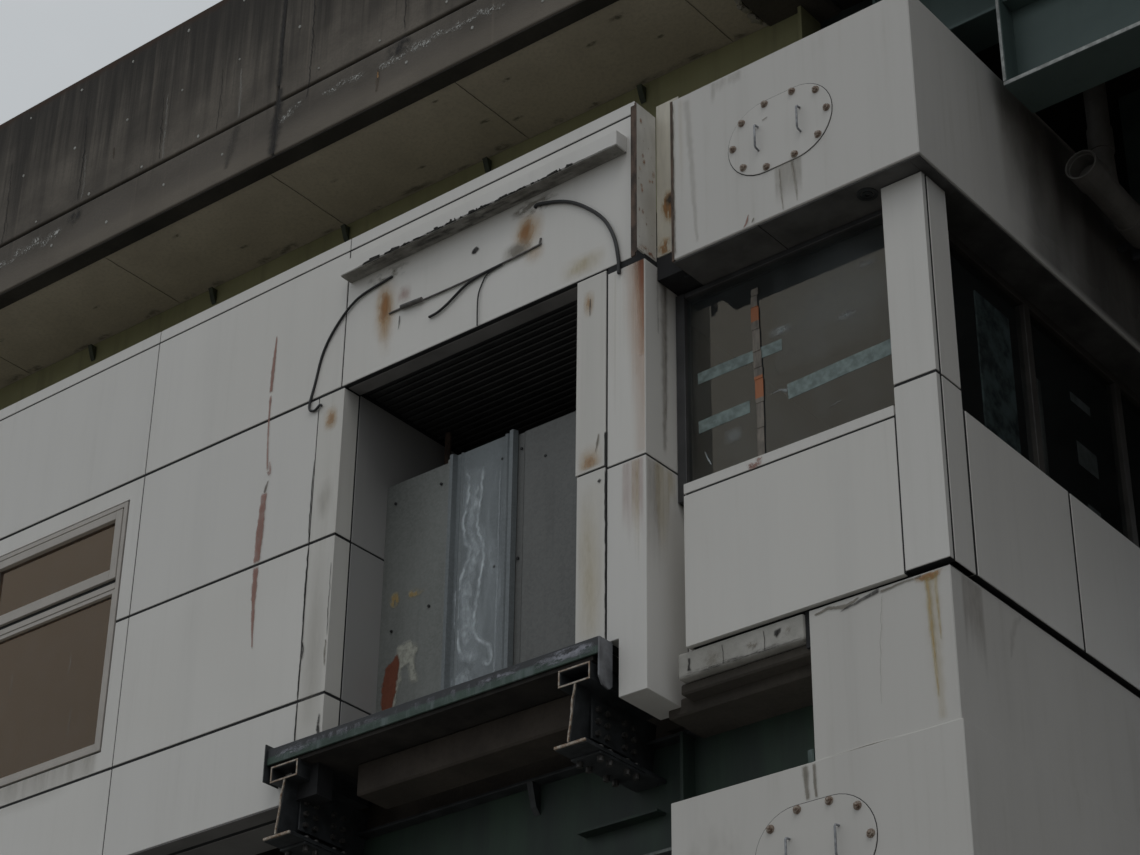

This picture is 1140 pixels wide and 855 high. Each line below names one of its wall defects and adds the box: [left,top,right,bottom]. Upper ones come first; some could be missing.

water stain [269,0,301,154]
peeling [362,163,573,266]
corrosion [509,219,534,257]
corrosion [379,292,391,323]
corrosion [251,337,277,647]
water stain [454,471,492,665]
corrosion [919,570,938,654]